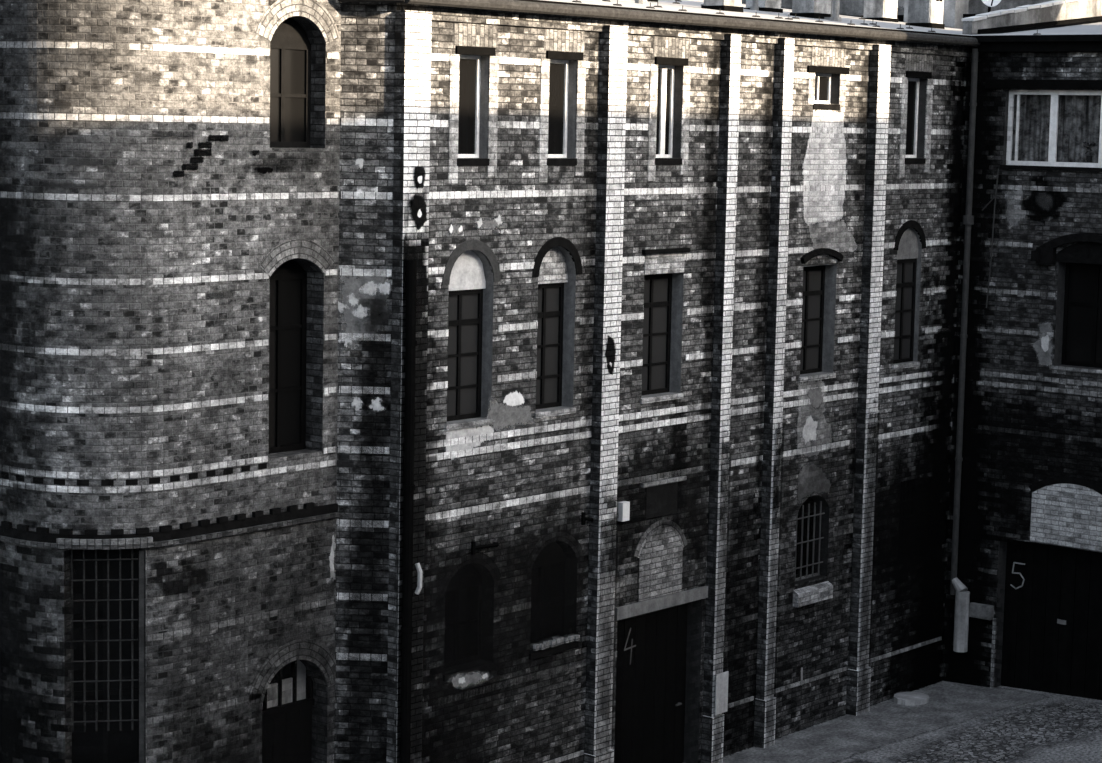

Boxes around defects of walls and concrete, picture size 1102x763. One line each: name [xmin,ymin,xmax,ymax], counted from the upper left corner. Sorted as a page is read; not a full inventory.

peeling [802,110,858,258]
spalling [338,266,390,353]
peeling [1033,322,1053,366]
spalling [351,397,384,411]